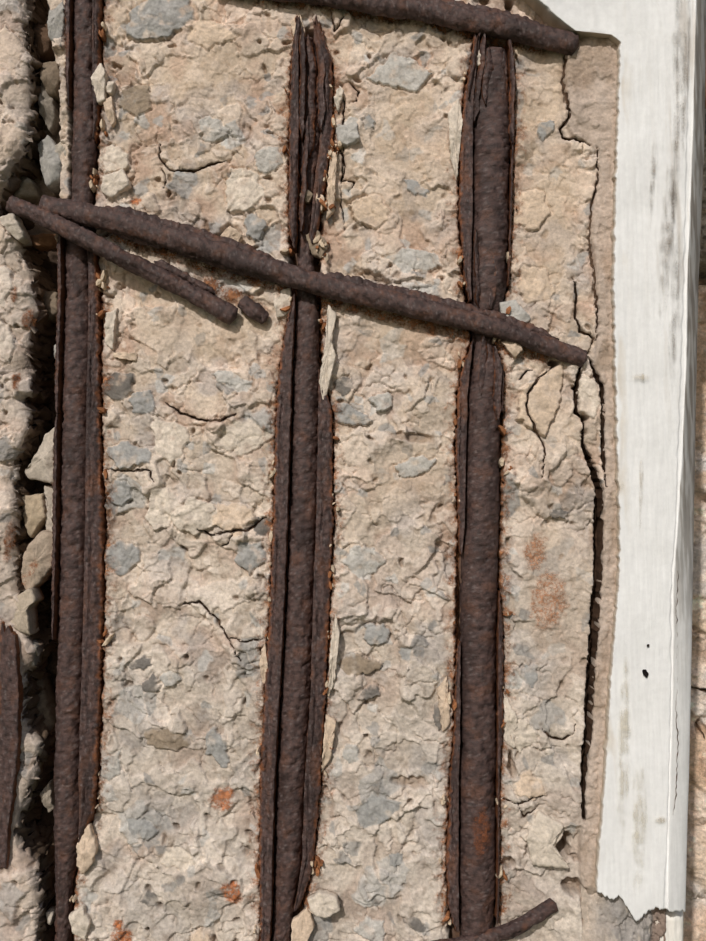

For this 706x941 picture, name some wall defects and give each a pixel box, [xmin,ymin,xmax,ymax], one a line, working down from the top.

spalling [0,622,23,869]
spalling [27,223,335,941]
corrosion [109,233,297,306]
spalling [33,0,516,312]
corrosion [299,766,332,913]
corrosion [316,295,471,924]
corrosion [258,0,545,302]
spalling [291,37,618,941]
corrosion [494,339,515,698]
crack [520,367,553,477]
crack [544,55,607,819]
peeling [578,884,667,941]